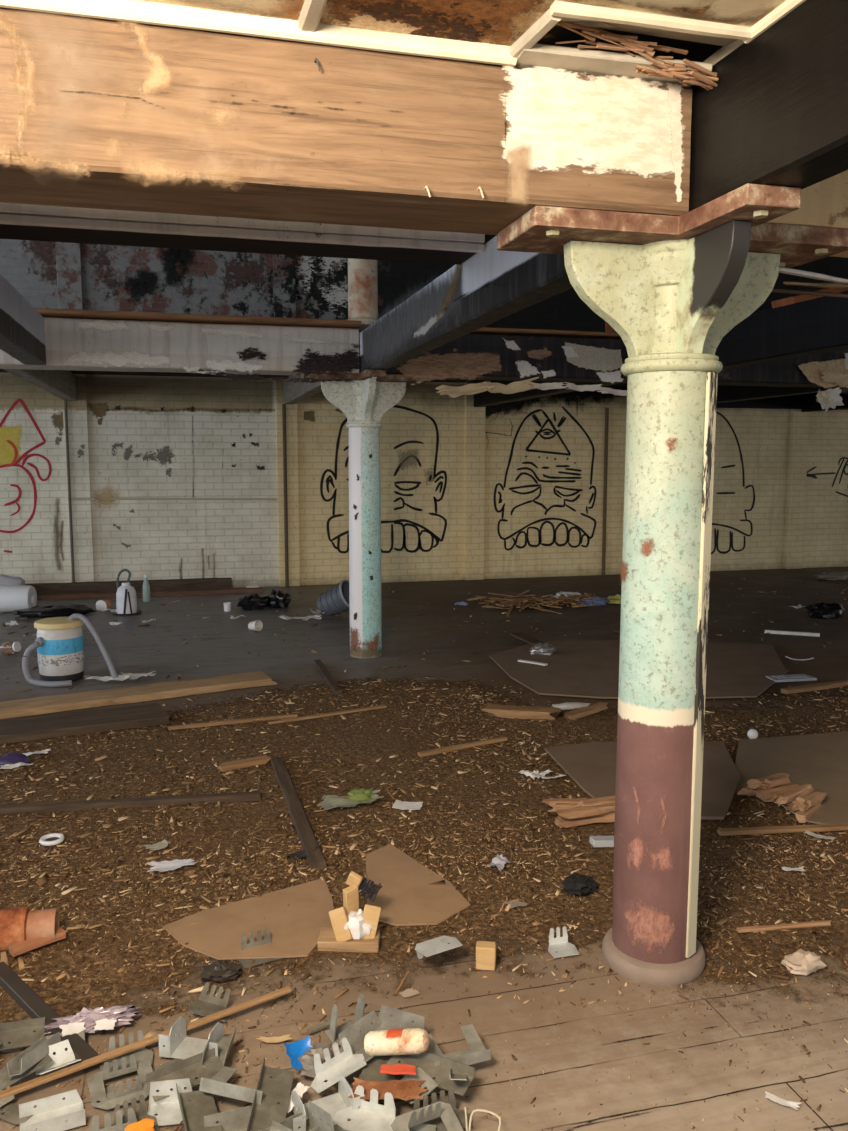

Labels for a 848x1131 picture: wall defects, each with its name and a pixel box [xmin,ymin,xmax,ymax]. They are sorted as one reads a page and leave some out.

peeling [500,66,685,202]
spalling [21,240,57,285]
peeling [295,256,348,312]
peeling [75,319,130,333]
peeling [63,348,265,375]
peeling [436,339,627,398]
peeling [798,353,848,412]
spalling [89,403,108,425]
peeling [111,443,174,477]
corrosion [350,628,382,658]
corrosion [627,838,672,870]
corrosion [625,900,674,952]